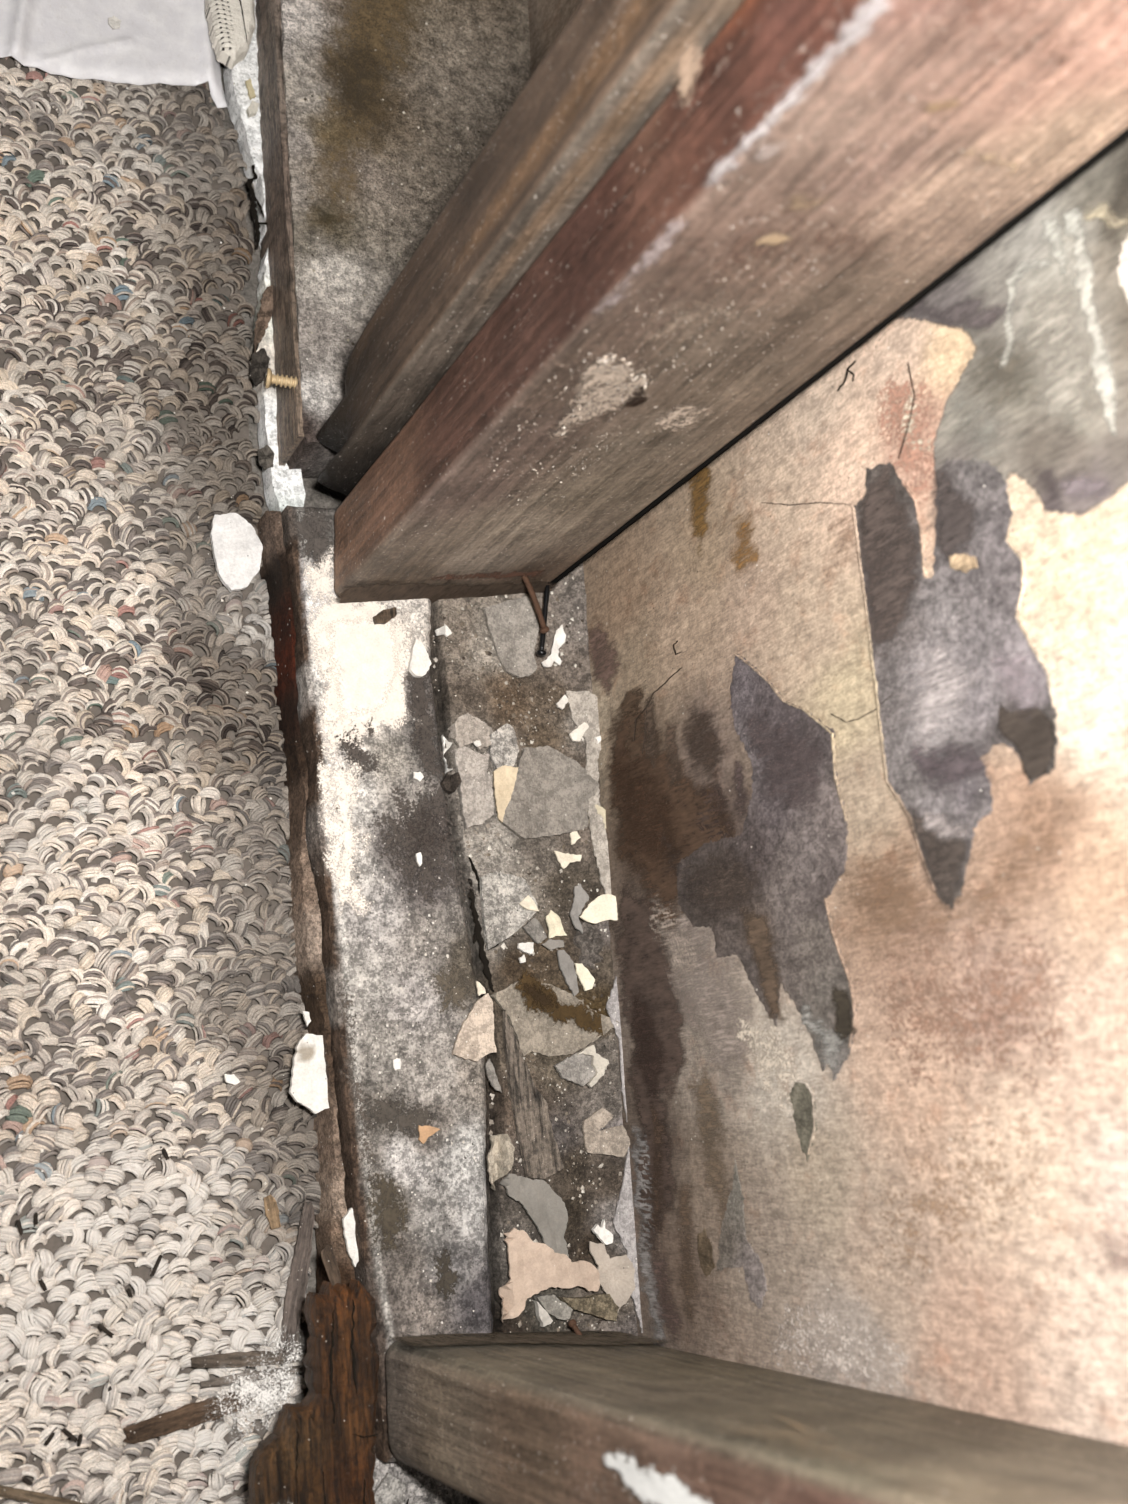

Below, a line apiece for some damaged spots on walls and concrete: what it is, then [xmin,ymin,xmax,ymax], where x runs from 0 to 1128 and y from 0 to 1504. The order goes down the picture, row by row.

damp [311,0,419,225]
peeling [483,596,566,678]
damp [334,651,477,907]
peeling [441,713,494,773]
peeling [493,765,518,822]
peeling [554,831,582,869]
peeling [569,722,601,744]
peeling [452,884,619,1093]
damp [394,624,814,1346]
damp [338,979,436,1253]
peeling [582,1108,630,1157]
peeling [487,1134,569,1258]